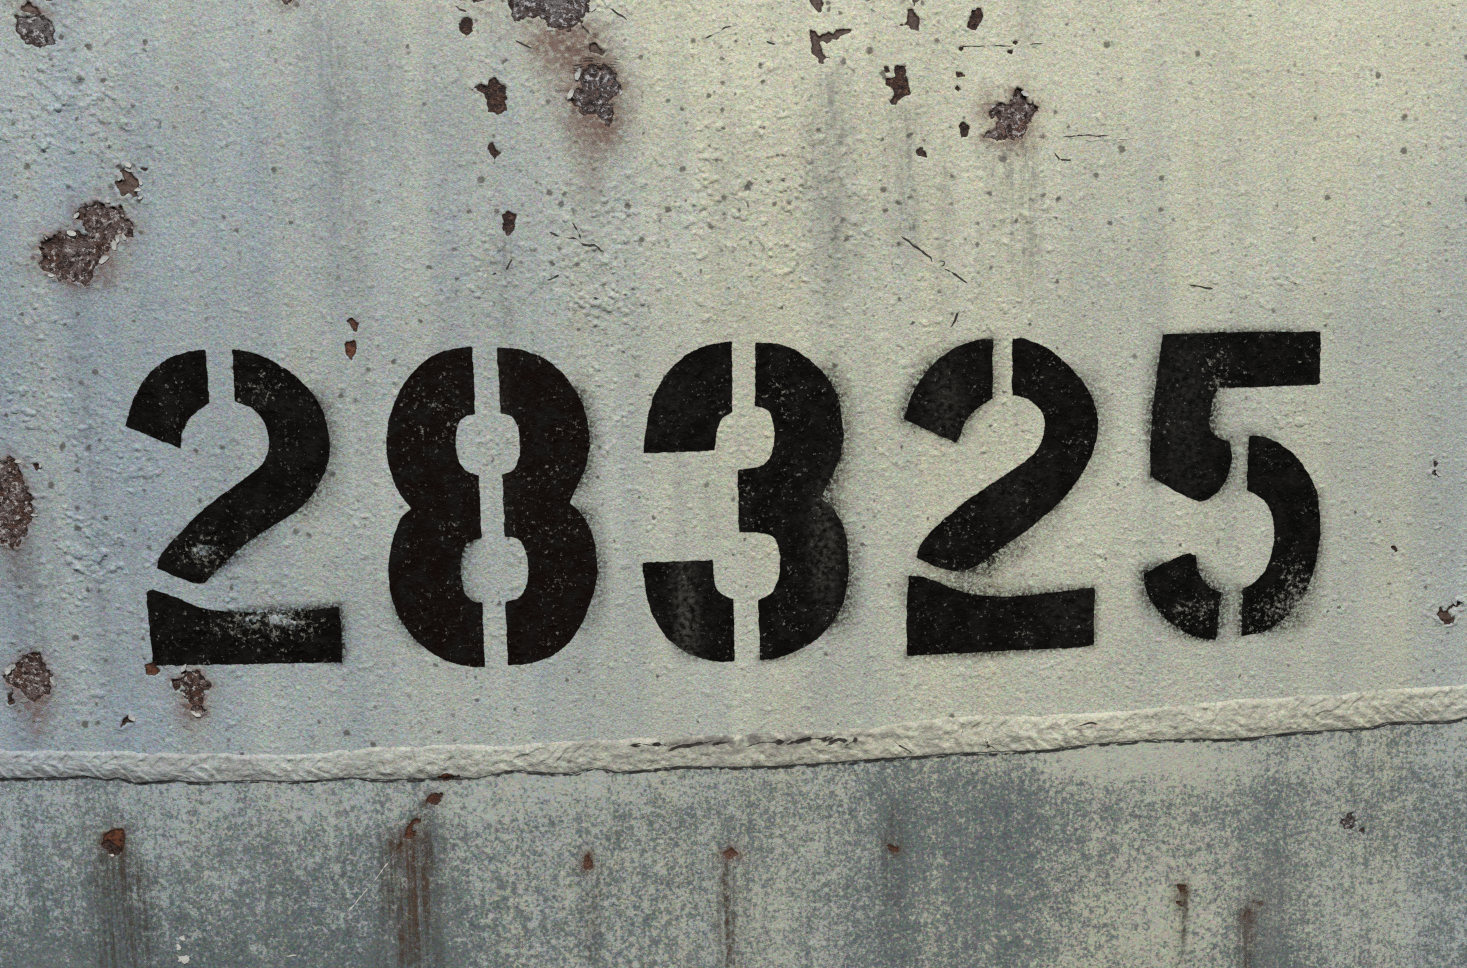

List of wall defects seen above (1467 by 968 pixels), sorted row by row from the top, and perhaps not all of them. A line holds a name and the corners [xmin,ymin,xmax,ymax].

peeling [470,77,507,115]
peeling [115,162,148,199]
corrosion [100,829,131,924]
corrosion [386,773,460,965]